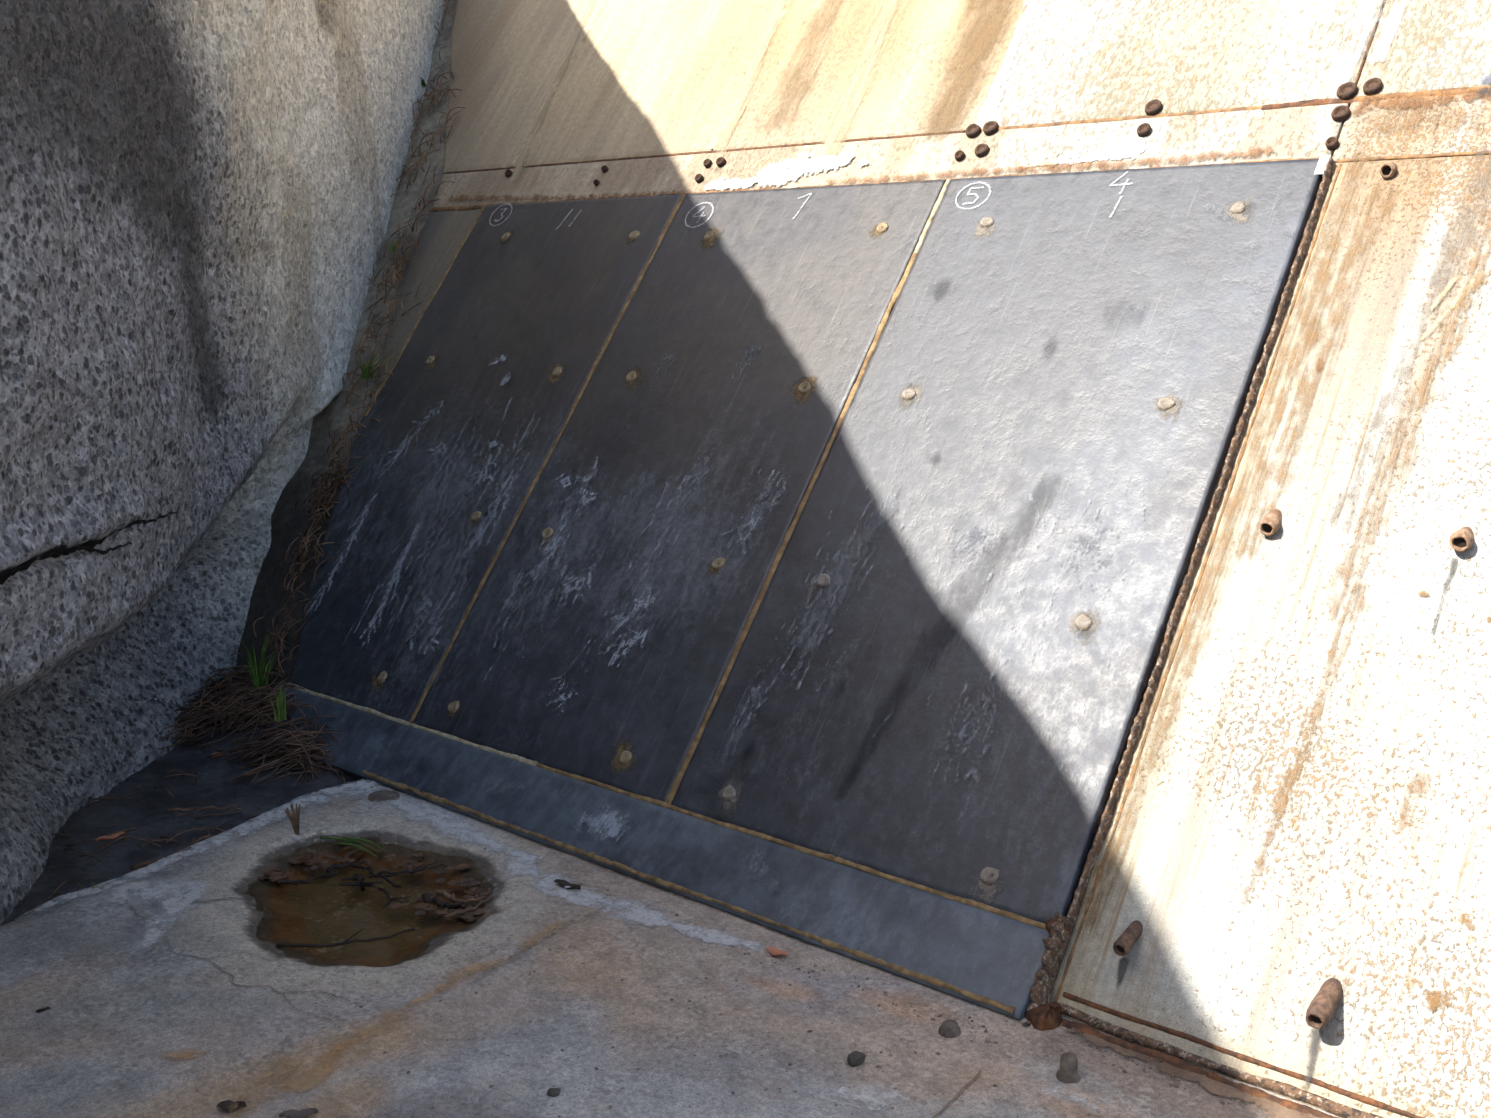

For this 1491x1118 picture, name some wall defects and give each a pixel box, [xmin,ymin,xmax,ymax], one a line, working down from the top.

rust [1353,87,1491,131]
rust [1377,211,1491,479]
rust [1083,156,1391,927]
water stain [20,779,760,950]
crack [118,895,343,1018]
rust [1425,991,1450,1011]
water stain [837,1085,899,1110]